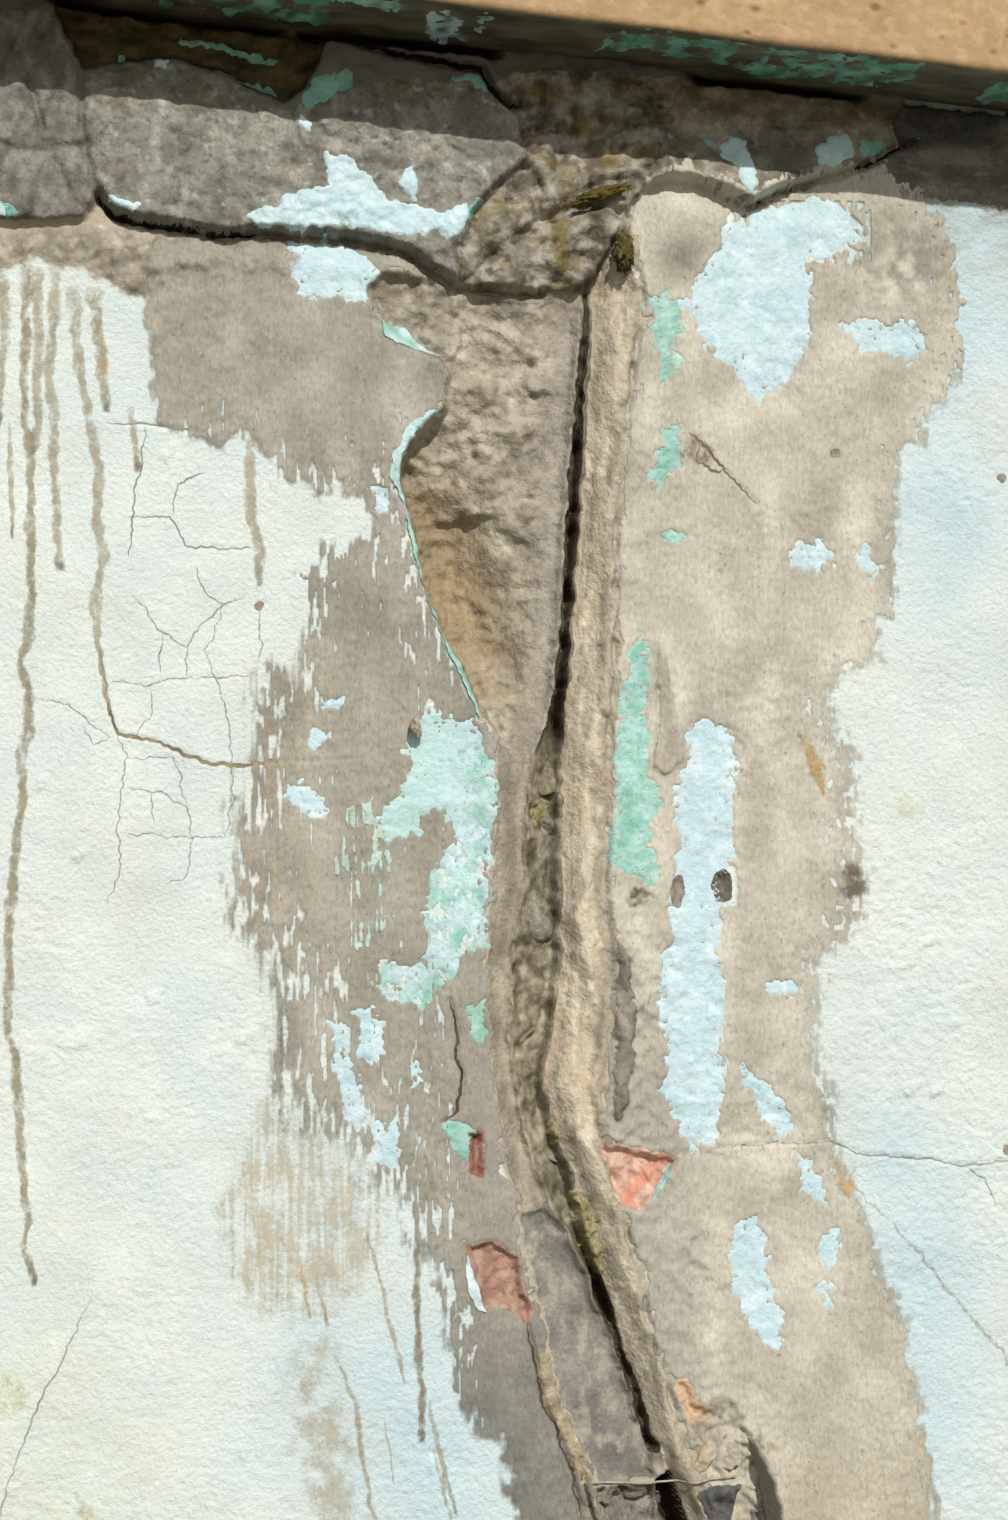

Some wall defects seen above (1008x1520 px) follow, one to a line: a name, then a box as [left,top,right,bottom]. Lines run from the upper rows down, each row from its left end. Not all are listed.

spalling [0,8,95,222]
leakage [0,265,112,1285]
peeling [104,188,141,212]
leakage [129,417,142,471]
crack [98,194,256,240]
crack [34,422,333,904]
peeling [0,225,666,1520]
crack [445,221,704,1520]
peeling [247,68,966,1520]
peeling [592,28,925,87]
leakage [222,1046,457,1520]
crack [716,1140,1008,1204]